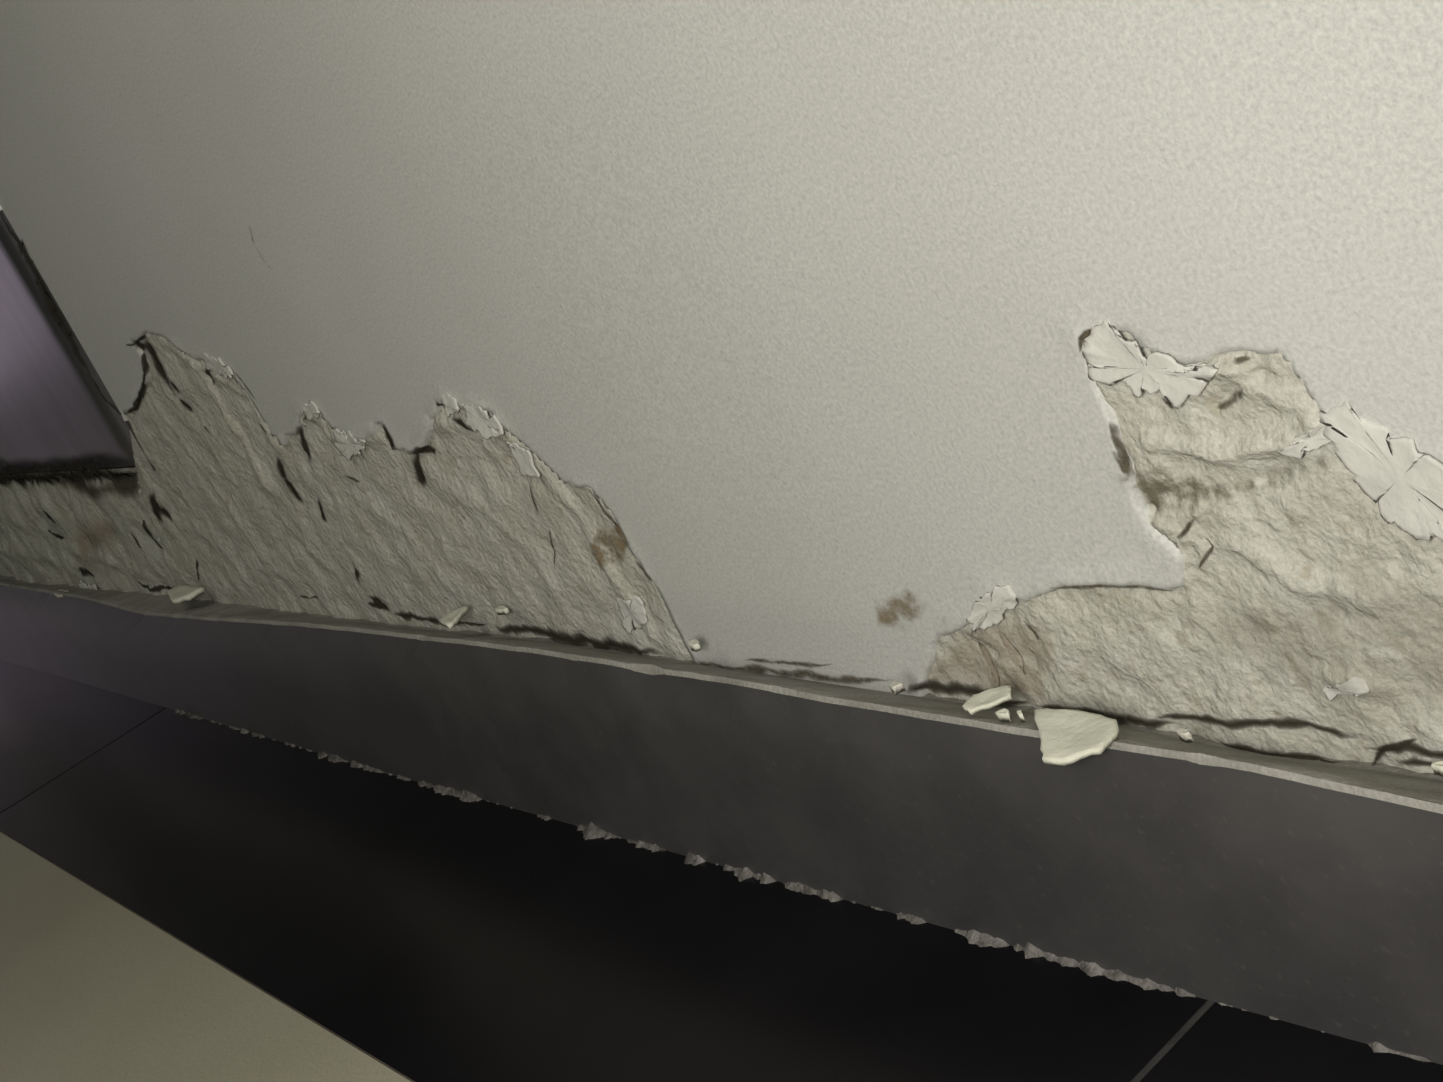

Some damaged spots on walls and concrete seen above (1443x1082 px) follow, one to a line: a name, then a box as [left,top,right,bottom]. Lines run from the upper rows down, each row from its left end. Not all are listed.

peeling [0,332,693,660]
peeling [927,318,1443,773]